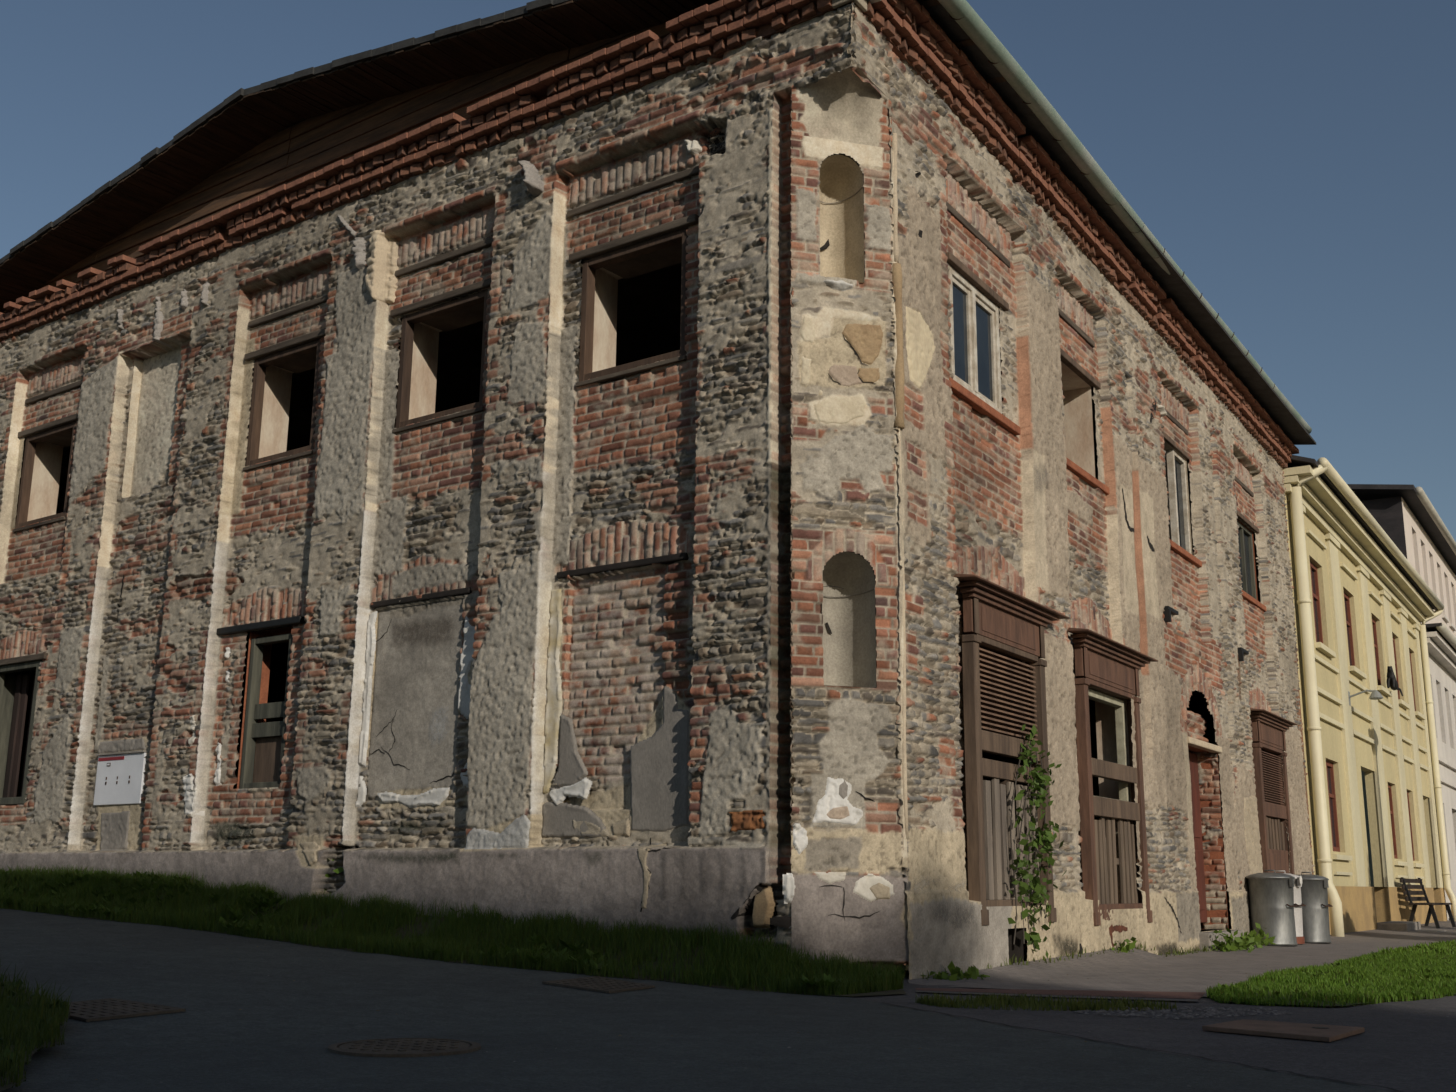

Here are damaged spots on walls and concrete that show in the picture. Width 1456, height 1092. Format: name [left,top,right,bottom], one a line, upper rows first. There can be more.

peeling [458,616,476,719]
peeling [355,611,468,808]
crack [371,710,454,783]
peeling [793,777,863,855]
peeling [770,873,796,930]
peeling [814,872,894,902]